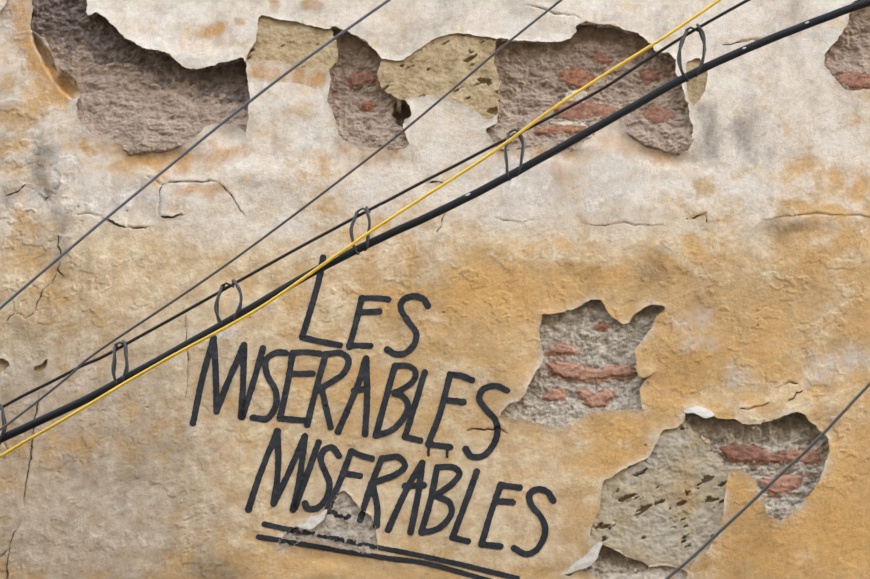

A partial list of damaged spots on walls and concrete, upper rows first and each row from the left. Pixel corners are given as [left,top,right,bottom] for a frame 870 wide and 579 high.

flaking render [30,0,708,157]
flaking render [824,0,870,91]
crack [77,175,243,229]
crack [6,235,62,321]
flaking render [501,299,665,427]
flaking render [278,491,378,553]
flaking render [565,406,830,579]